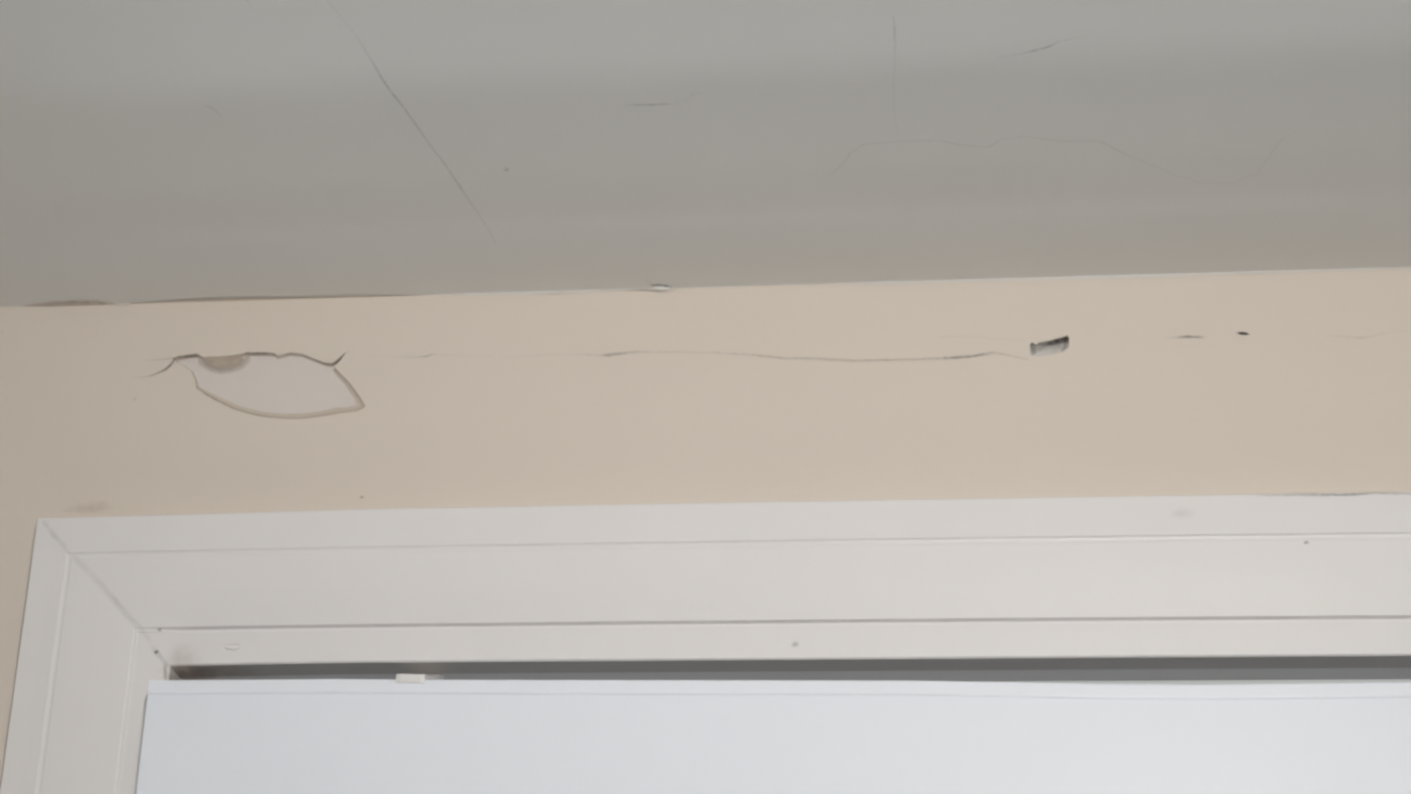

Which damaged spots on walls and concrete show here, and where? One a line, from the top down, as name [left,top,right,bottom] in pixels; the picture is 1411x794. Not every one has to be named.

spalling [1030,335,1069,356]
peeling [176,352,366,419]